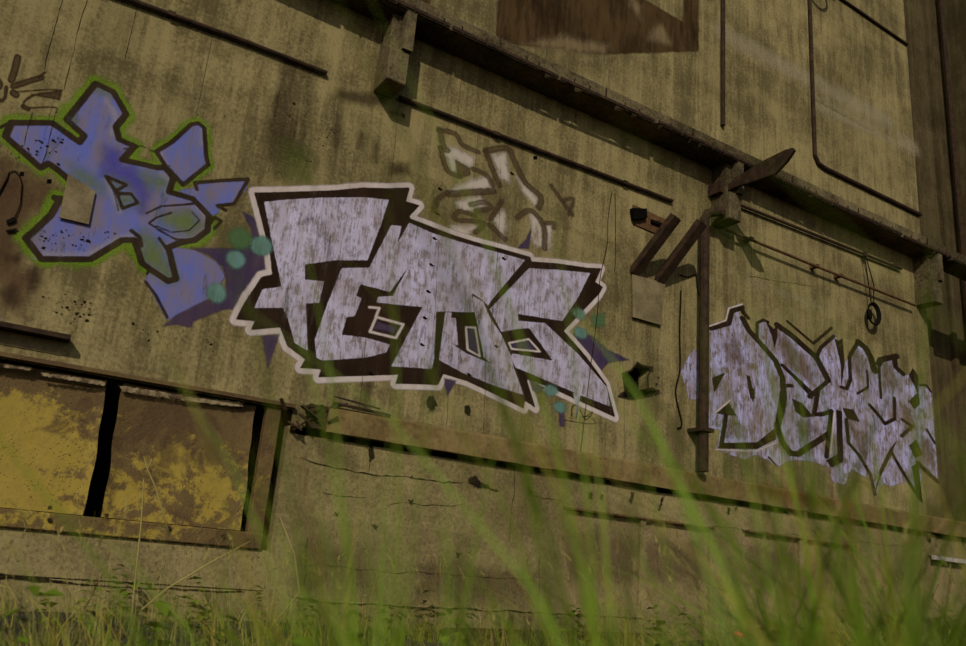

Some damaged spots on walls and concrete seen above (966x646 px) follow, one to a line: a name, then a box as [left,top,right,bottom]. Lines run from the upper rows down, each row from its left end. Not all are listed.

crack [300,454,515,514]